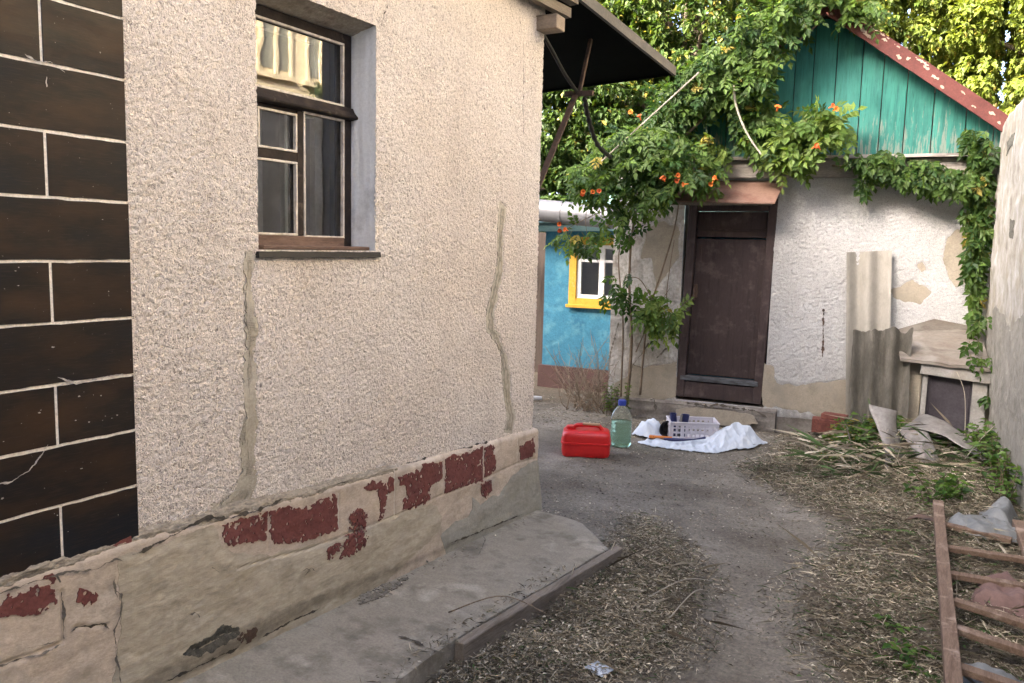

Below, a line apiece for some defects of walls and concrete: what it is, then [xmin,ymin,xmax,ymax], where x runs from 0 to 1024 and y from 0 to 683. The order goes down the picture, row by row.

flaking render [943,229,967,287]
flaking render [891,262,931,304]
peeling [519,438,535,460]
peeling [222,444,496,560]
peeling [0,573,58,618]
peeling [76,588,99,607]
spalling [356,577,409,605]
spalling [183,624,258,658]